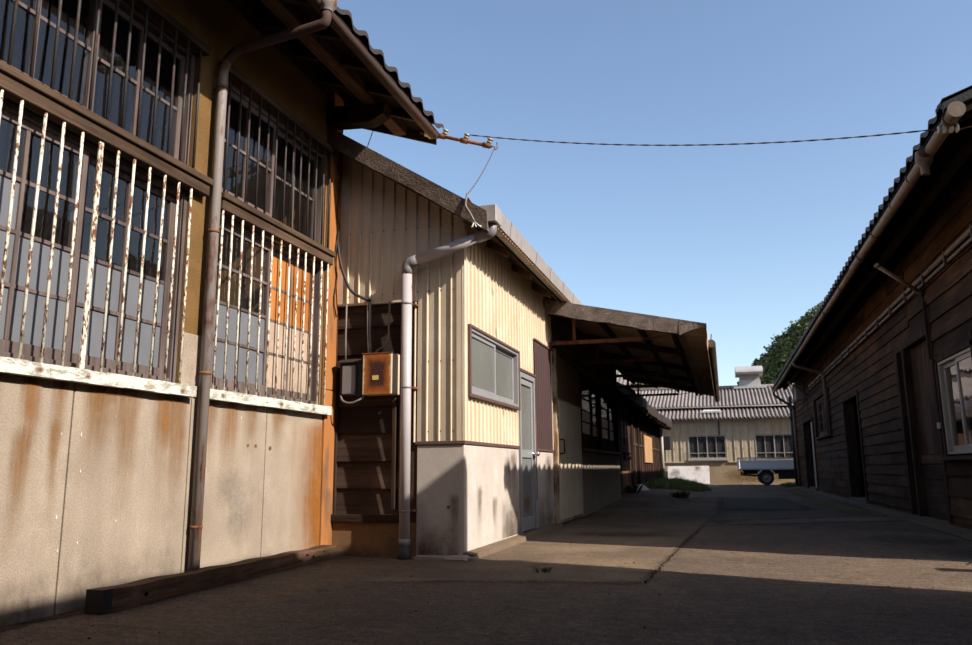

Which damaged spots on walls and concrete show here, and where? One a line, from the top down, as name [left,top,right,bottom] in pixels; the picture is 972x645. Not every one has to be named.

rust [26,367,43,421]
rust [87,375,118,418]
rust [159,389,184,448]